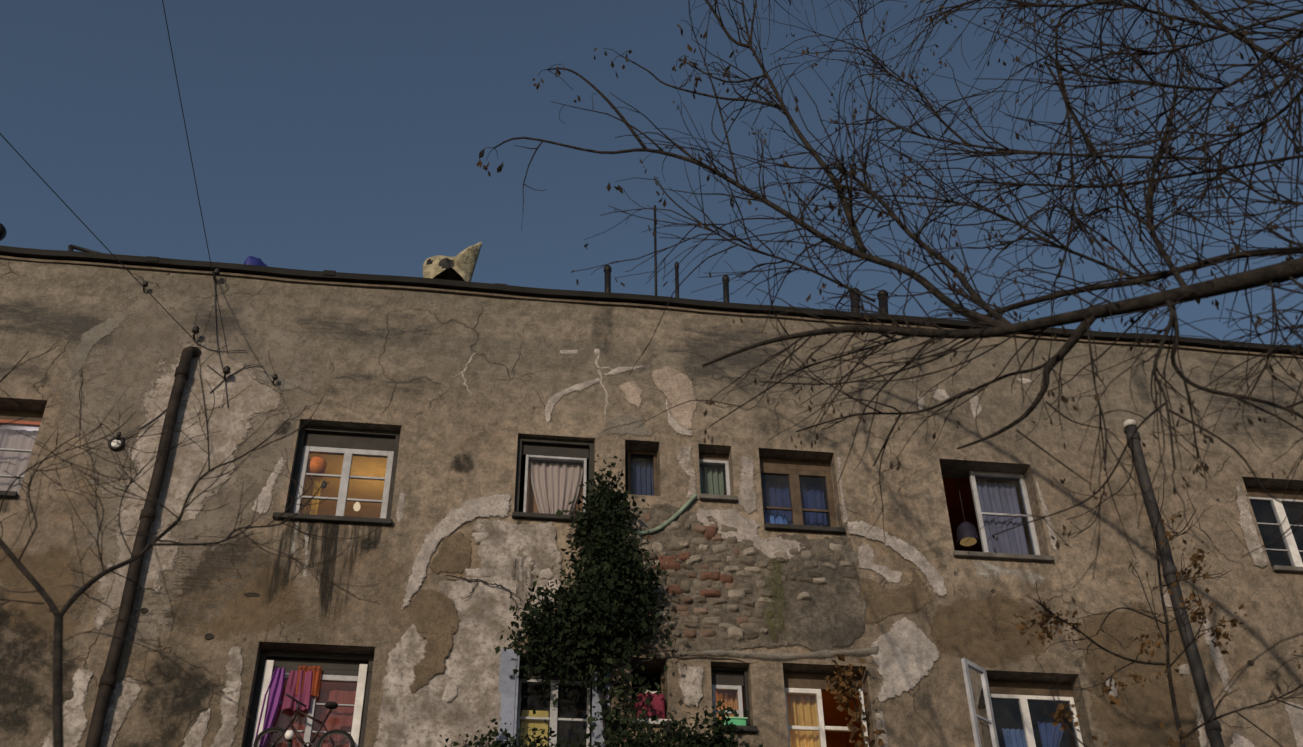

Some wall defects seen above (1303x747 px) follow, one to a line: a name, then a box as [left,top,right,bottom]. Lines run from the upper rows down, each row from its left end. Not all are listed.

peeling [69,316,127,381]
peeling [92,340,299,630]
water stain [268,522,382,616]
peeling [374,491,563,747]
peeling [656,457,947,747]
peeling [1236,482,1268,568]